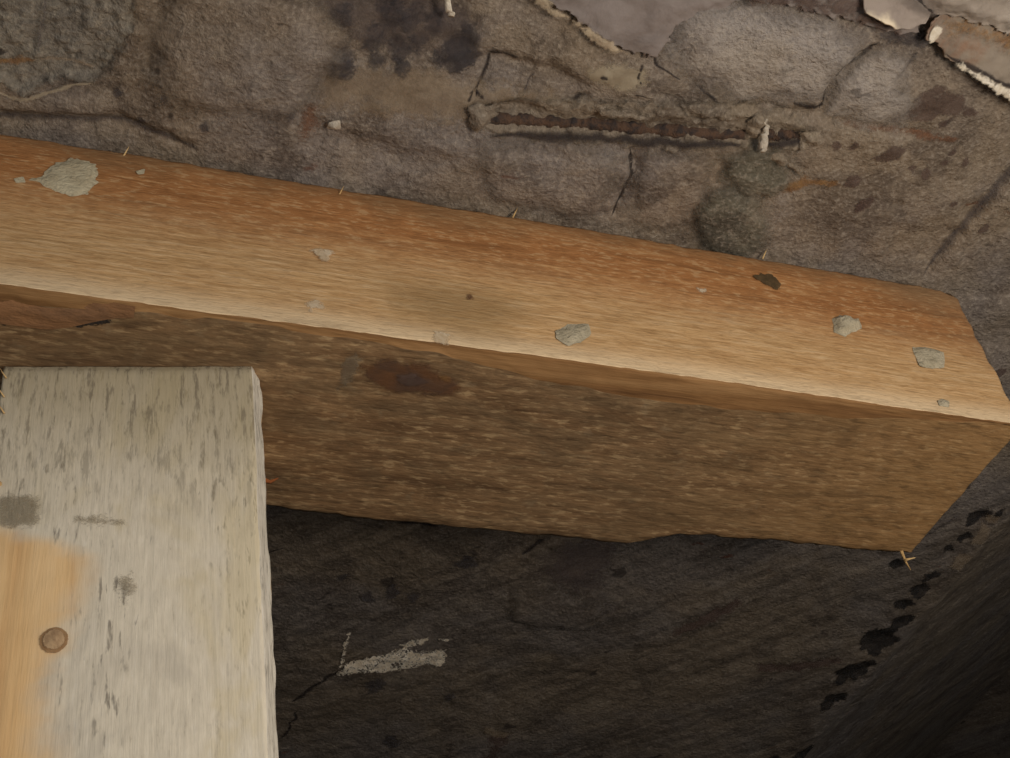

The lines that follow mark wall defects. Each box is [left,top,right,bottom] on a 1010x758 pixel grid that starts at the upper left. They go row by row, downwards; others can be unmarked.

water stain [319,0,470,48]
peeling [535,0,735,58]
peeling [761,0,1010,101]